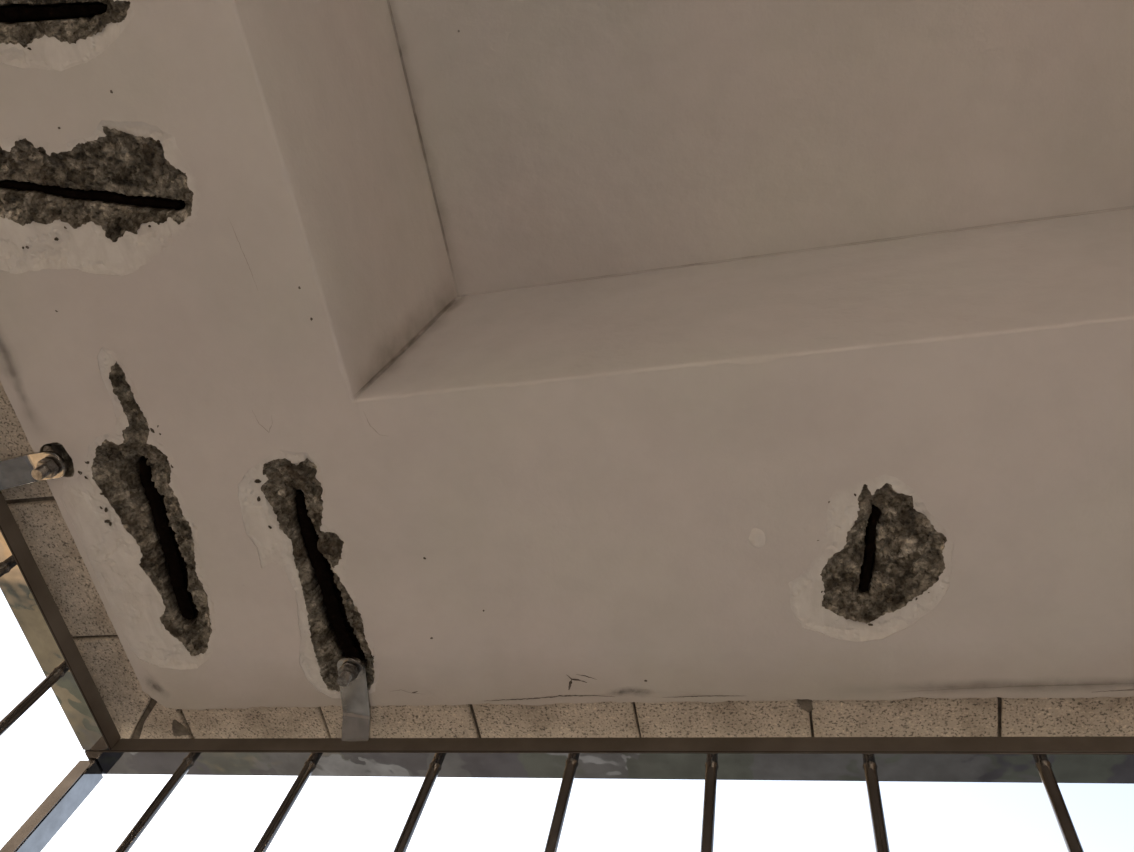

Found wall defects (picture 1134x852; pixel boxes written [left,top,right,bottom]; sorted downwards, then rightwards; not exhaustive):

spalling [0,0,135,71]
spalling [0,120,201,276]
spalling [39,347,217,670]
spalling [238,449,380,699]
spalling [789,474,953,642]